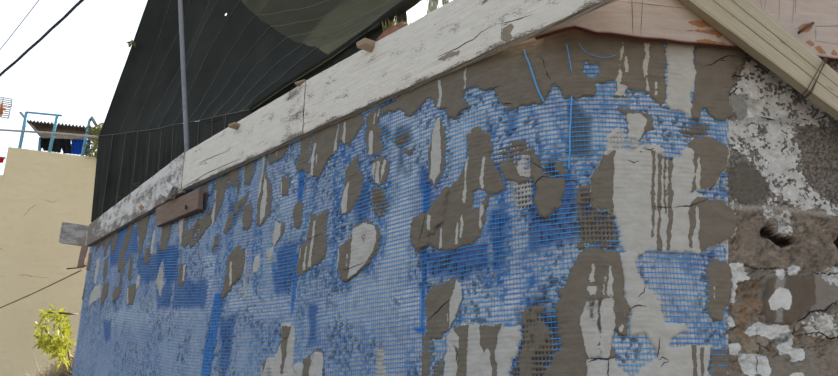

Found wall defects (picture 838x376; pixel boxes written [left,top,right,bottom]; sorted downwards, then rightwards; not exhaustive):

peeling [728,61,838,248]
peeling [729,262,750,303]
peeling [769,265,800,311]
peeling [816,266,838,286]
peeling [728,343,772,376]
peeling [744,321,805,362]
peeling [800,312,838,340]